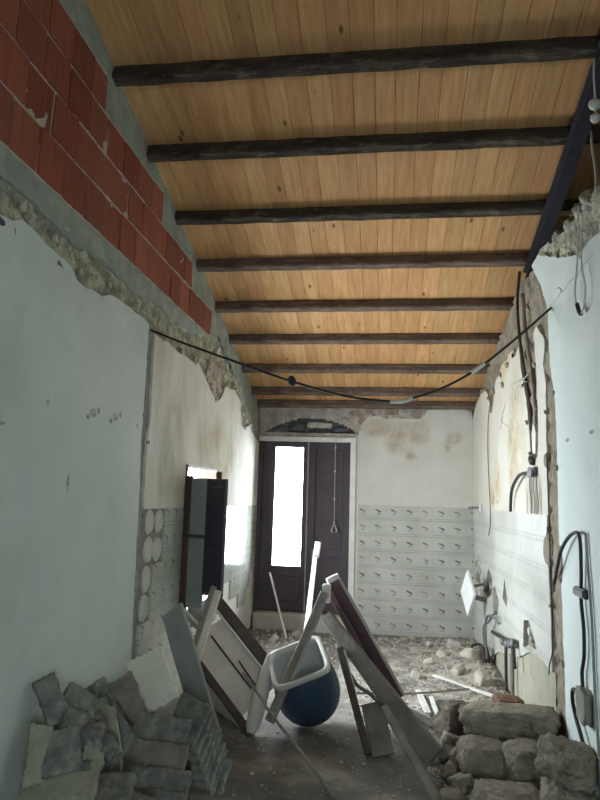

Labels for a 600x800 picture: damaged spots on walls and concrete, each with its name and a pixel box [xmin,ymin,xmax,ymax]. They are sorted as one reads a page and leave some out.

spalling [0,143,430,440]
spalling [467,270,548,416]
peeling [475,554,507,613]
flaking render [492,620,564,712]